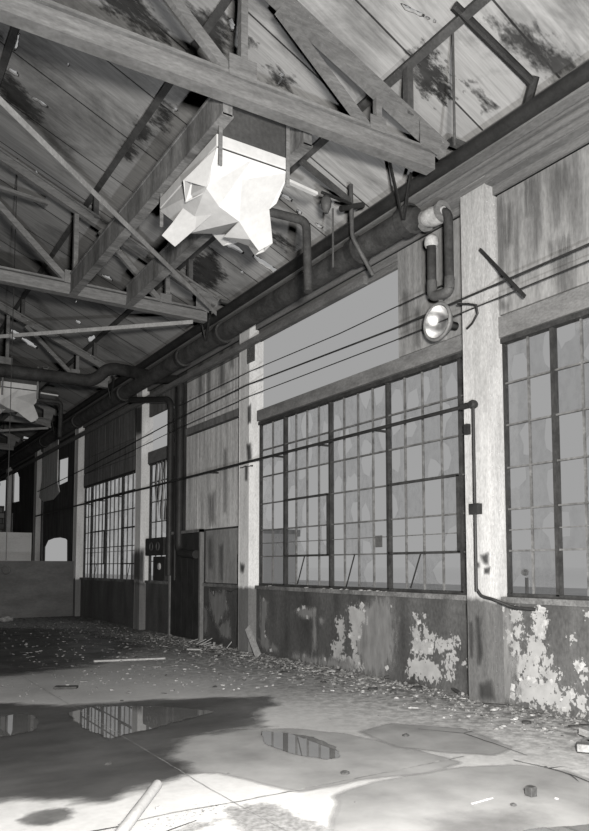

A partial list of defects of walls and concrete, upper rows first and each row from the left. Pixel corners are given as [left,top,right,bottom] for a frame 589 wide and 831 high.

damp [413,51,451,104]
damp [495,22,576,75]
peeling [292,588,398,678]
peeling [405,612,468,684]
peeling [502,604,589,718]